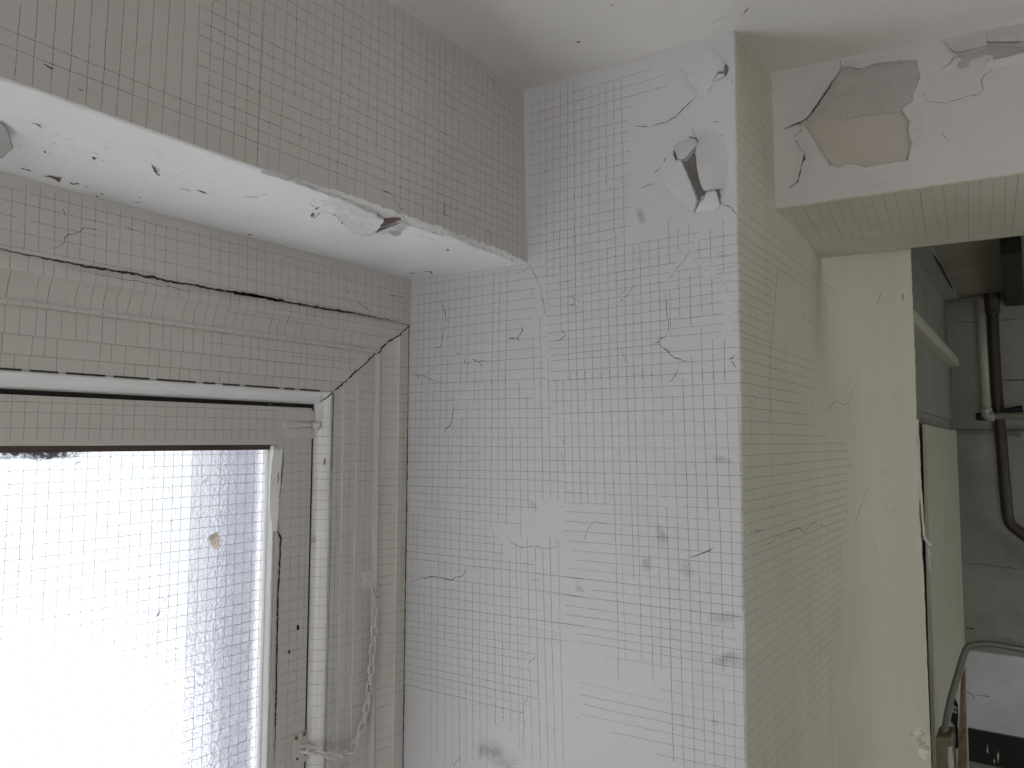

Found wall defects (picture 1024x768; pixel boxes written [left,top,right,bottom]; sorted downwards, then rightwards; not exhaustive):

peeling [942,24,1024,73]
flaking render [261,170,405,237]
crack [635,76,733,188]
peeling [657,128,729,213]
peeling [782,53,927,177]
crack [0,210,482,497]
crack [620,248,690,382]
crack [274,531,282,766]
crack [402,416,470,768]